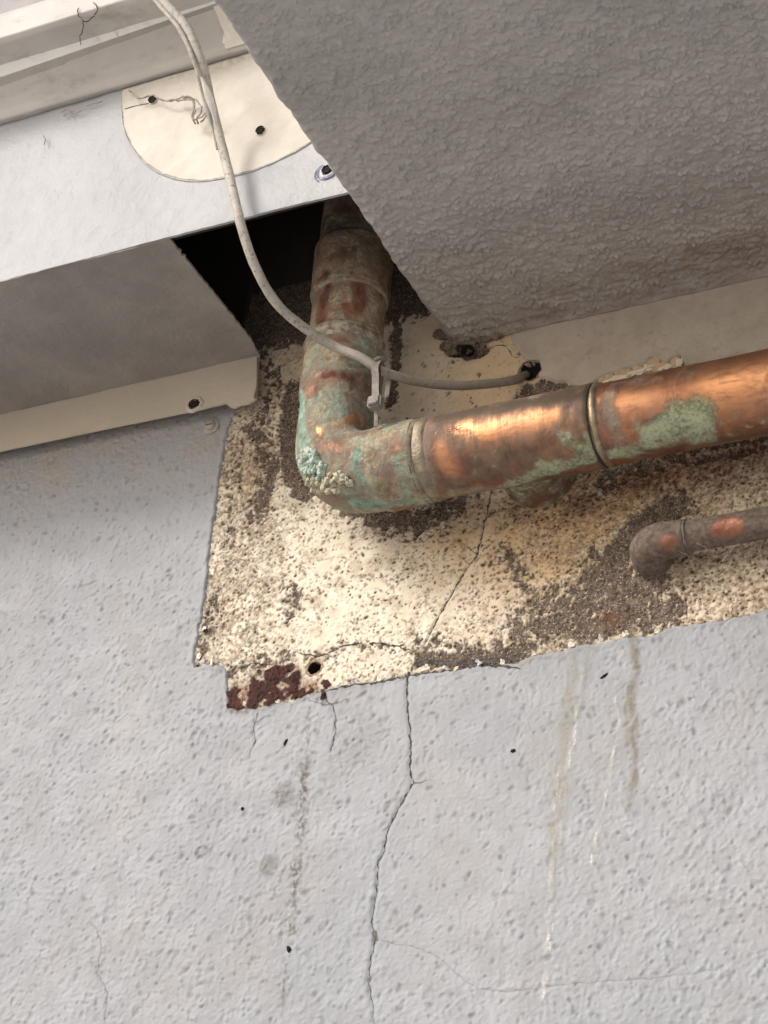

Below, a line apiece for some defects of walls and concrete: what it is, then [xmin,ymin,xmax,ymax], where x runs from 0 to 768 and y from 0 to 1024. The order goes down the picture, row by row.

corrosion [226,663,331,710]
peeling [195,263,768,709]
crack [300,491,715,1024]